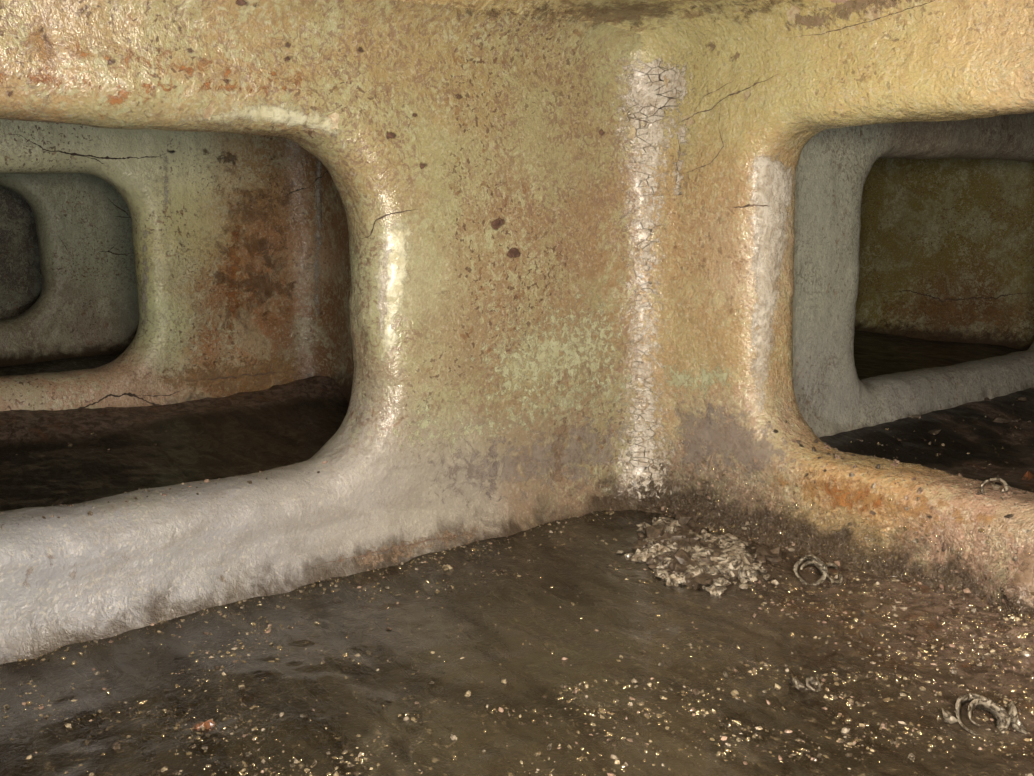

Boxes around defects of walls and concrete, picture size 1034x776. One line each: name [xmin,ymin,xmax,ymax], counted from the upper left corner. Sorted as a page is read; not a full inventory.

crack [623,63,778,174]
crack [4,133,175,164]
rust [215,185,292,331]
crack [77,370,289,409]
rust [803,472,993,531]